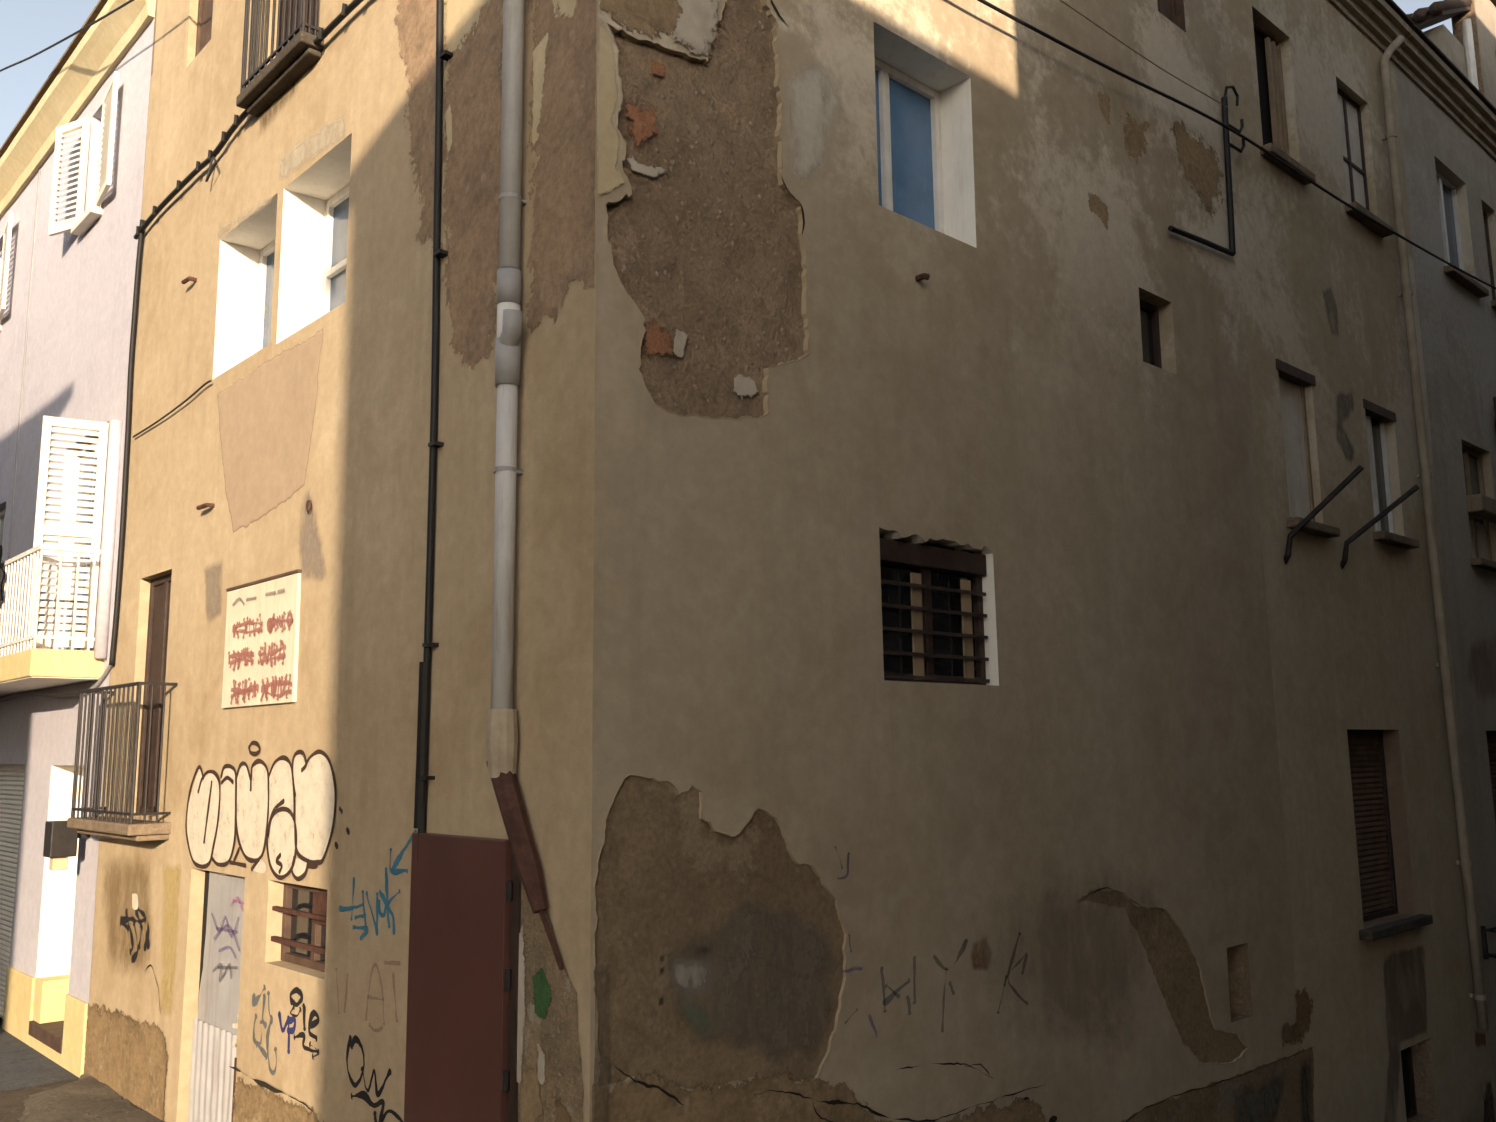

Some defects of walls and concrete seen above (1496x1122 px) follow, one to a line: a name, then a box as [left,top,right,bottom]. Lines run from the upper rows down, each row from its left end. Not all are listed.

peeling [394,0,503,370]
spalling [525,0,811,422]
flaking render [84,1003,168,1121]
flaking render [231,1077,324,1122]
crack [614,1065,683,1105]
spalling [517,773,891,1122]
crack [755,1062,1053,1122]
flaking render [947,1097,1057,1122]
spalling [1076,887,1248,1065]
flaking render [1282,988,1313,1046]